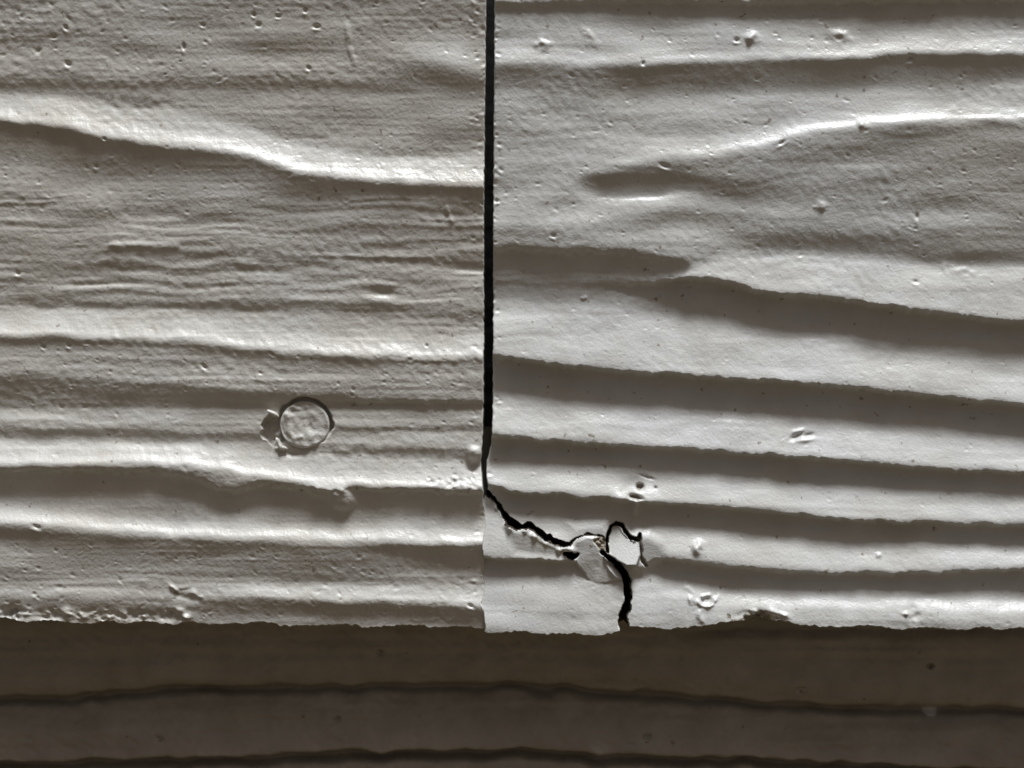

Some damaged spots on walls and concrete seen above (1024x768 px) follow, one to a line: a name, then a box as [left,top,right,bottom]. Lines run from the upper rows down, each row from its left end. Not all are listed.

crack [485,488,632,628]